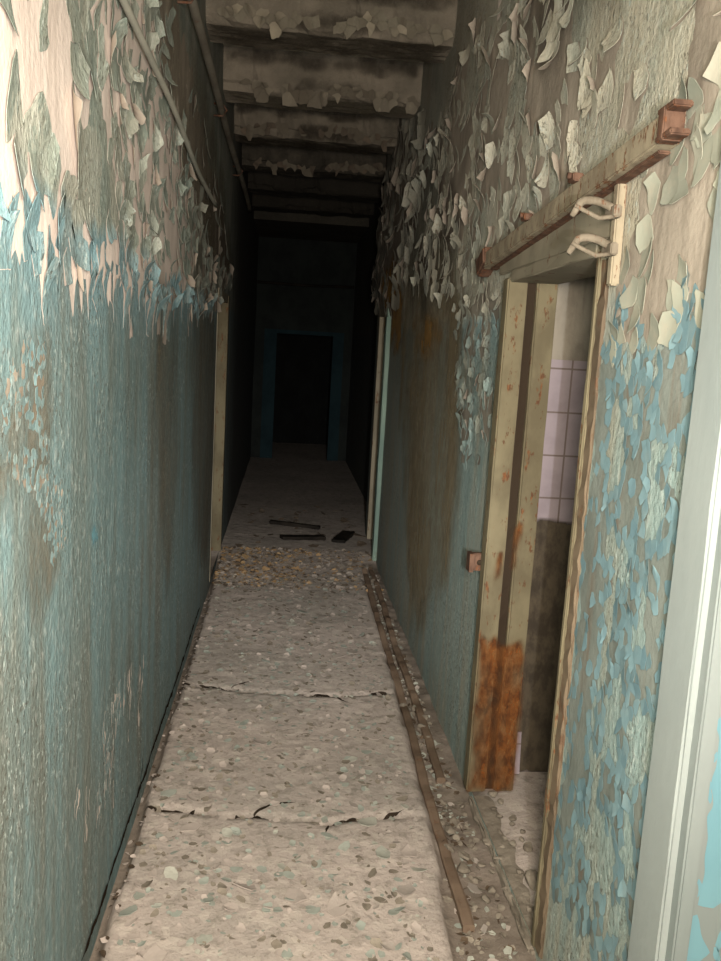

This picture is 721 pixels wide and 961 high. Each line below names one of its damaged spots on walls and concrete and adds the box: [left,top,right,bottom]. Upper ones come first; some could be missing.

flaking render [216,3,320,39]
peeling [0,0,234,345]
peeling [239,0,649,473]
peeling [518,0,721,961]
crack [299,691,387,703]
corrosion [472,638,523,791]
crack [235,802,295,820]
crack [325,818,357,832]
crack [383,809,404,820]